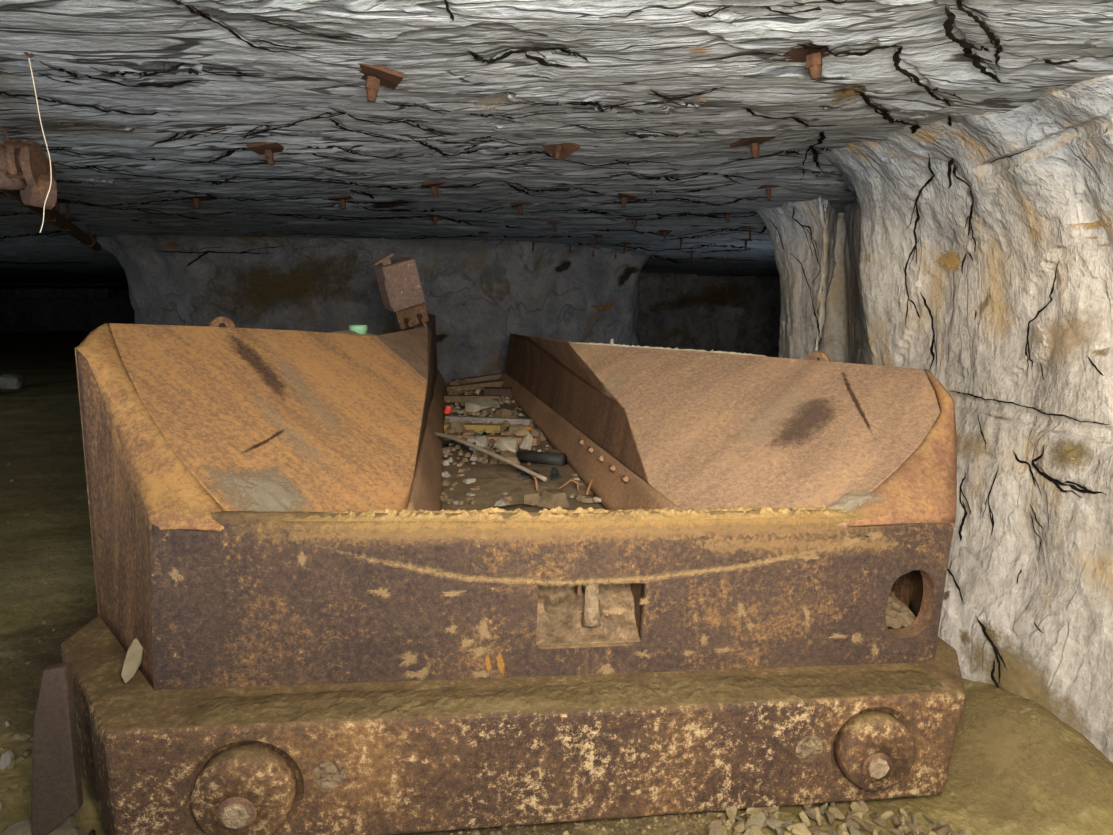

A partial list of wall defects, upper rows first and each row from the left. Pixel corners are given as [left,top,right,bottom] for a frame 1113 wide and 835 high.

crack [717,43,962,126]
crack [943,0,1011,83]
crack [1042,58,1078,66]
crack [0,0,847,345]
crack [834,89,976,371]
crack [1025,261,1059,380]
crack [949,390,1110,584]
crack [947,568,1008,688]